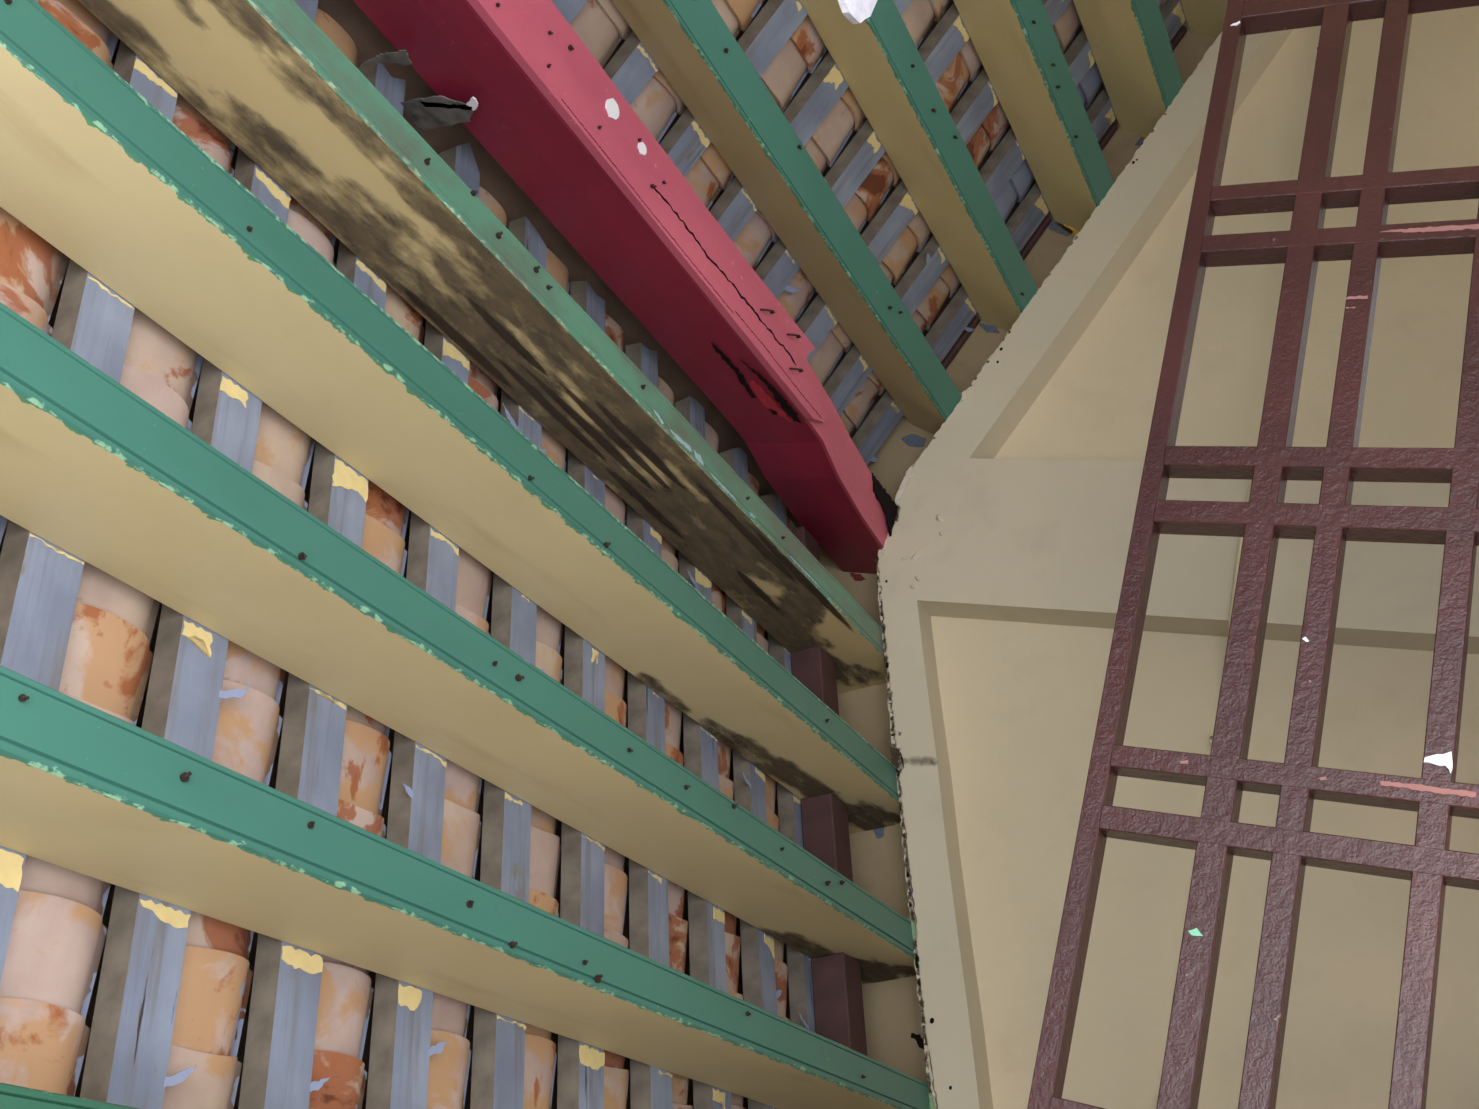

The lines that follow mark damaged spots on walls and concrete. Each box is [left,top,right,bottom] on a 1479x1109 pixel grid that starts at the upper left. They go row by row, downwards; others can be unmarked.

water stain [78,0,163,65]
crack [561,99,821,418]
peeling [749,380,792,422]
water stain [176,0,932,1095]
peeling [1380,751,1477,798]